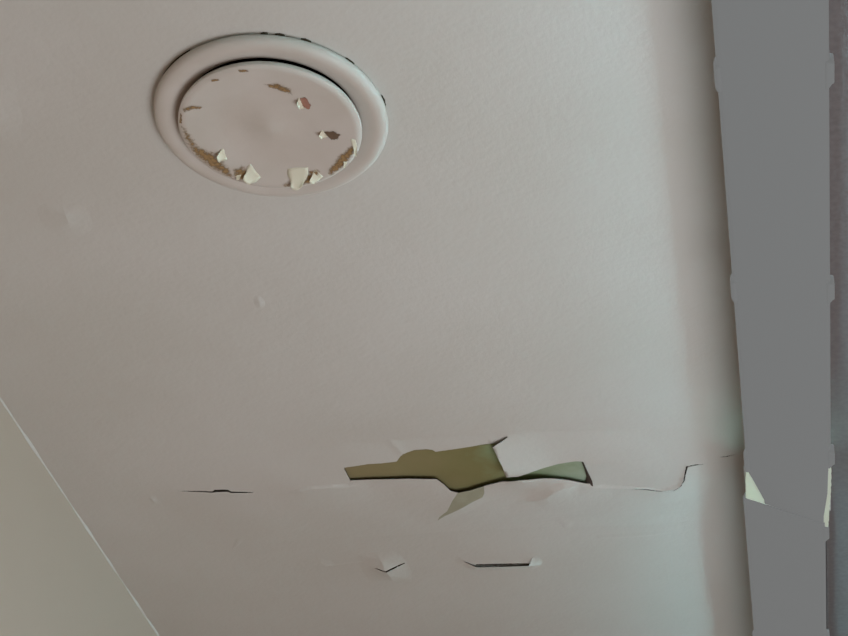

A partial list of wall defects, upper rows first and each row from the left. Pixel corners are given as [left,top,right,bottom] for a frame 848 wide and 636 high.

peeling [297,98,311,109]
peeling [319,130,340,140]
rust [185,133,246,179]
rust [330,147,354,174]
peeling [234,164,261,185]
peeling [287,167,323,190]
peeling [345,435,593,520]